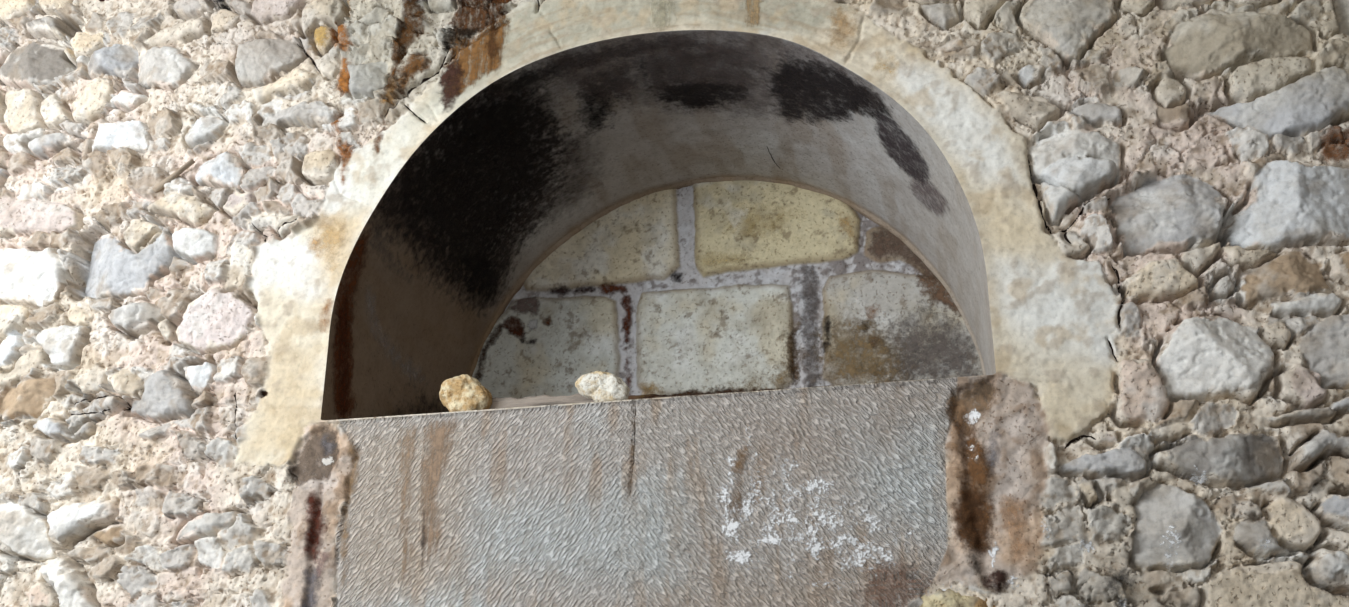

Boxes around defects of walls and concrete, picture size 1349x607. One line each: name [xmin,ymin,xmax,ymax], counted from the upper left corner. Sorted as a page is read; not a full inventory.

corrosion [382,0,511,110]
damp [912,182,945,213]
damp [511,296,540,329]
damp [640,229,978,399]
damp [714,427,952,599]